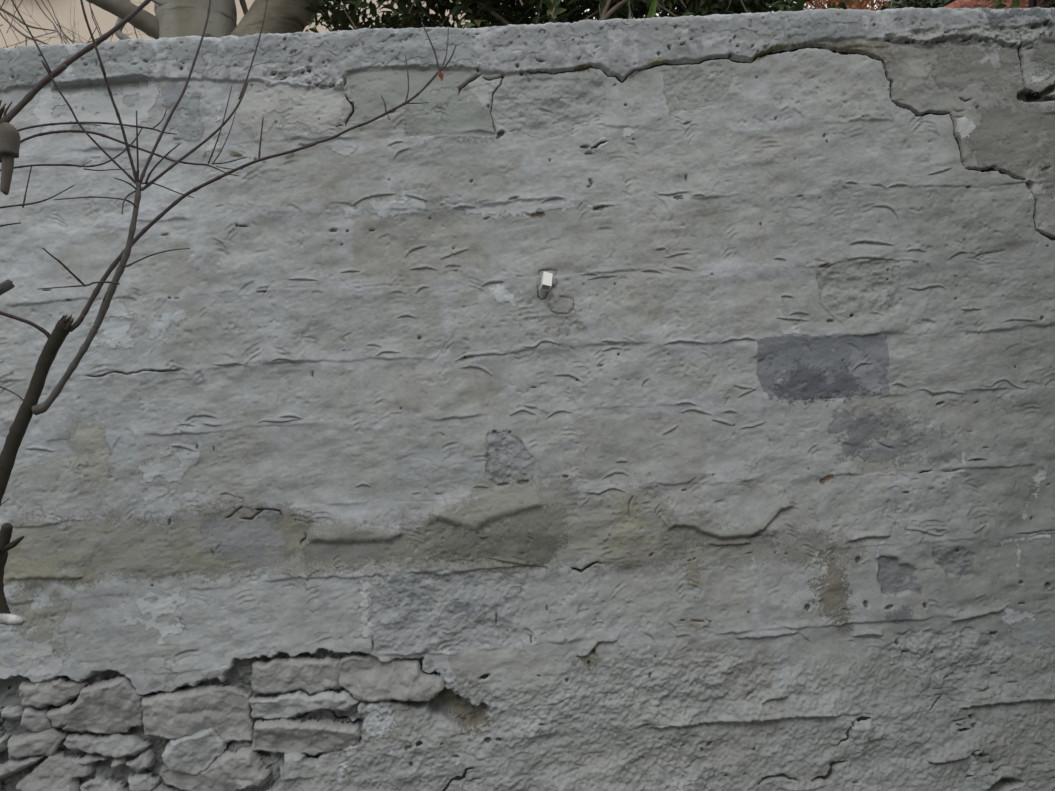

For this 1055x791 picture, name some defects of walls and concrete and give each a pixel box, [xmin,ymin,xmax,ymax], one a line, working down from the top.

crack [458,47,1055,241]
crack [537,270,574,314]
water stain [3,419,868,665]
spalling [0,568,527,791]